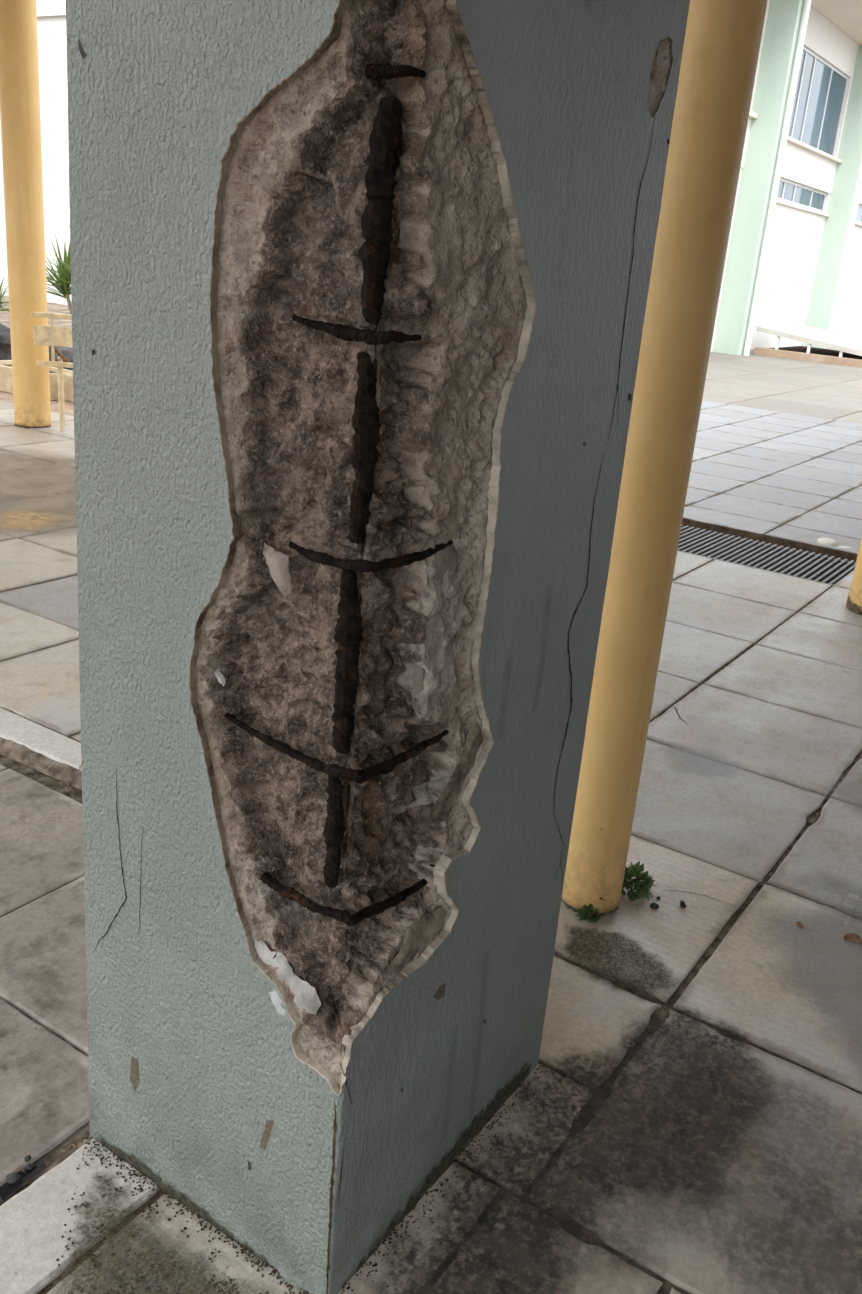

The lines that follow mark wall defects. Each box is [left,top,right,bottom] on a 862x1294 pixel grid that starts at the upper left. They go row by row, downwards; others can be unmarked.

spalling [189,0,537,1096]
crack [554,122,654,880]
leakage [101,1139,277,1271]
leakage [342,1010,772,1294]